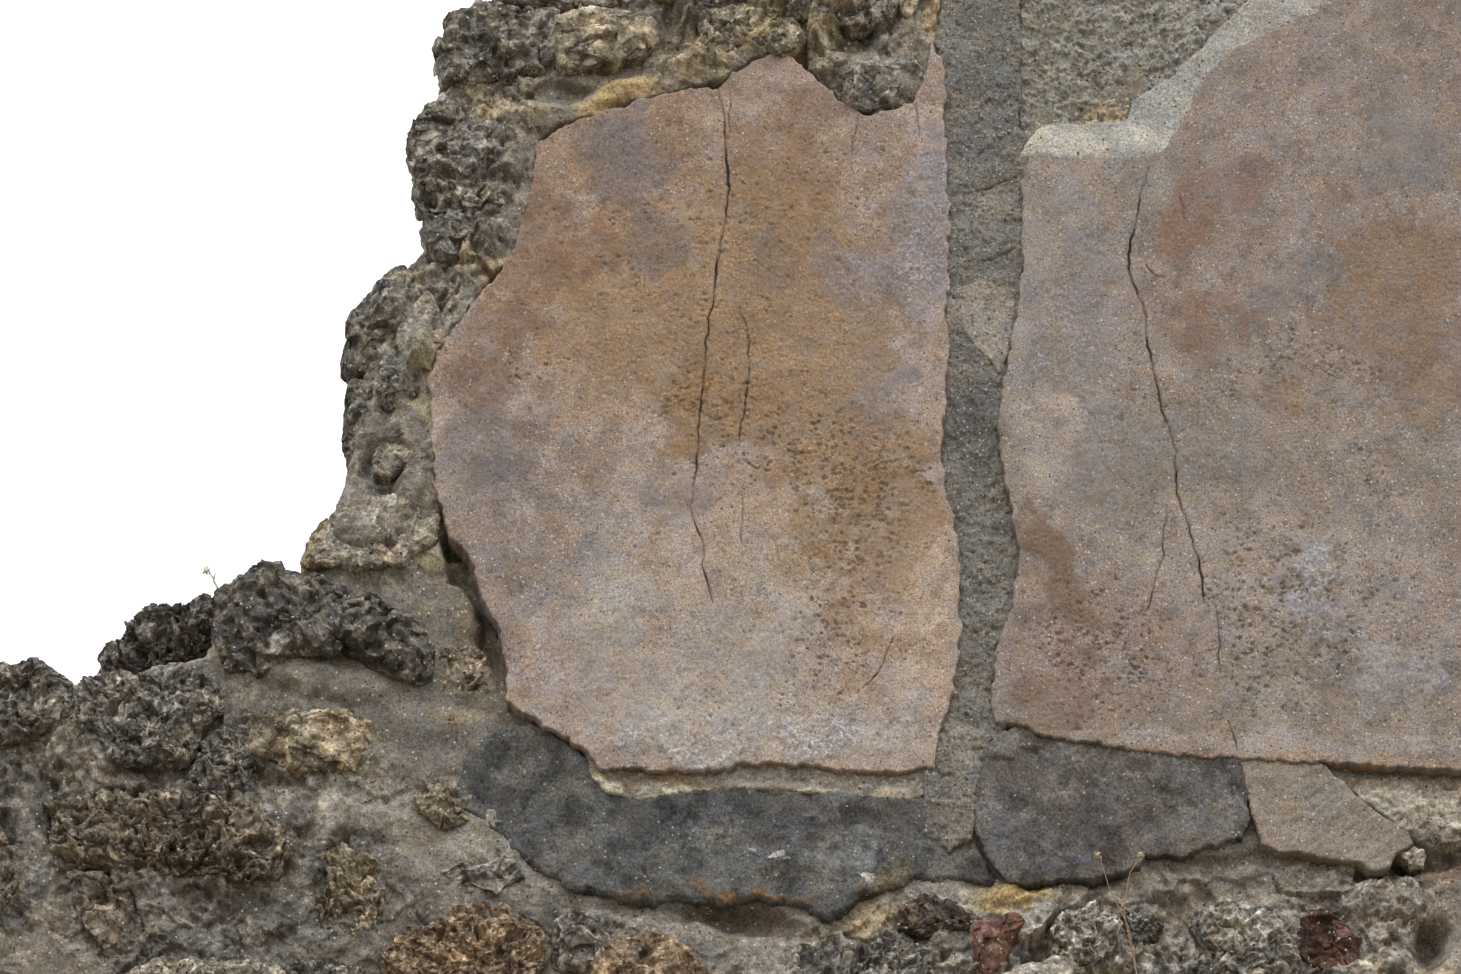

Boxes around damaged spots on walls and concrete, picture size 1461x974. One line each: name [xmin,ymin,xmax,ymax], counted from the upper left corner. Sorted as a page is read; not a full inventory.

crack [691,94,750,603]
crack [1128,176,1221,669]